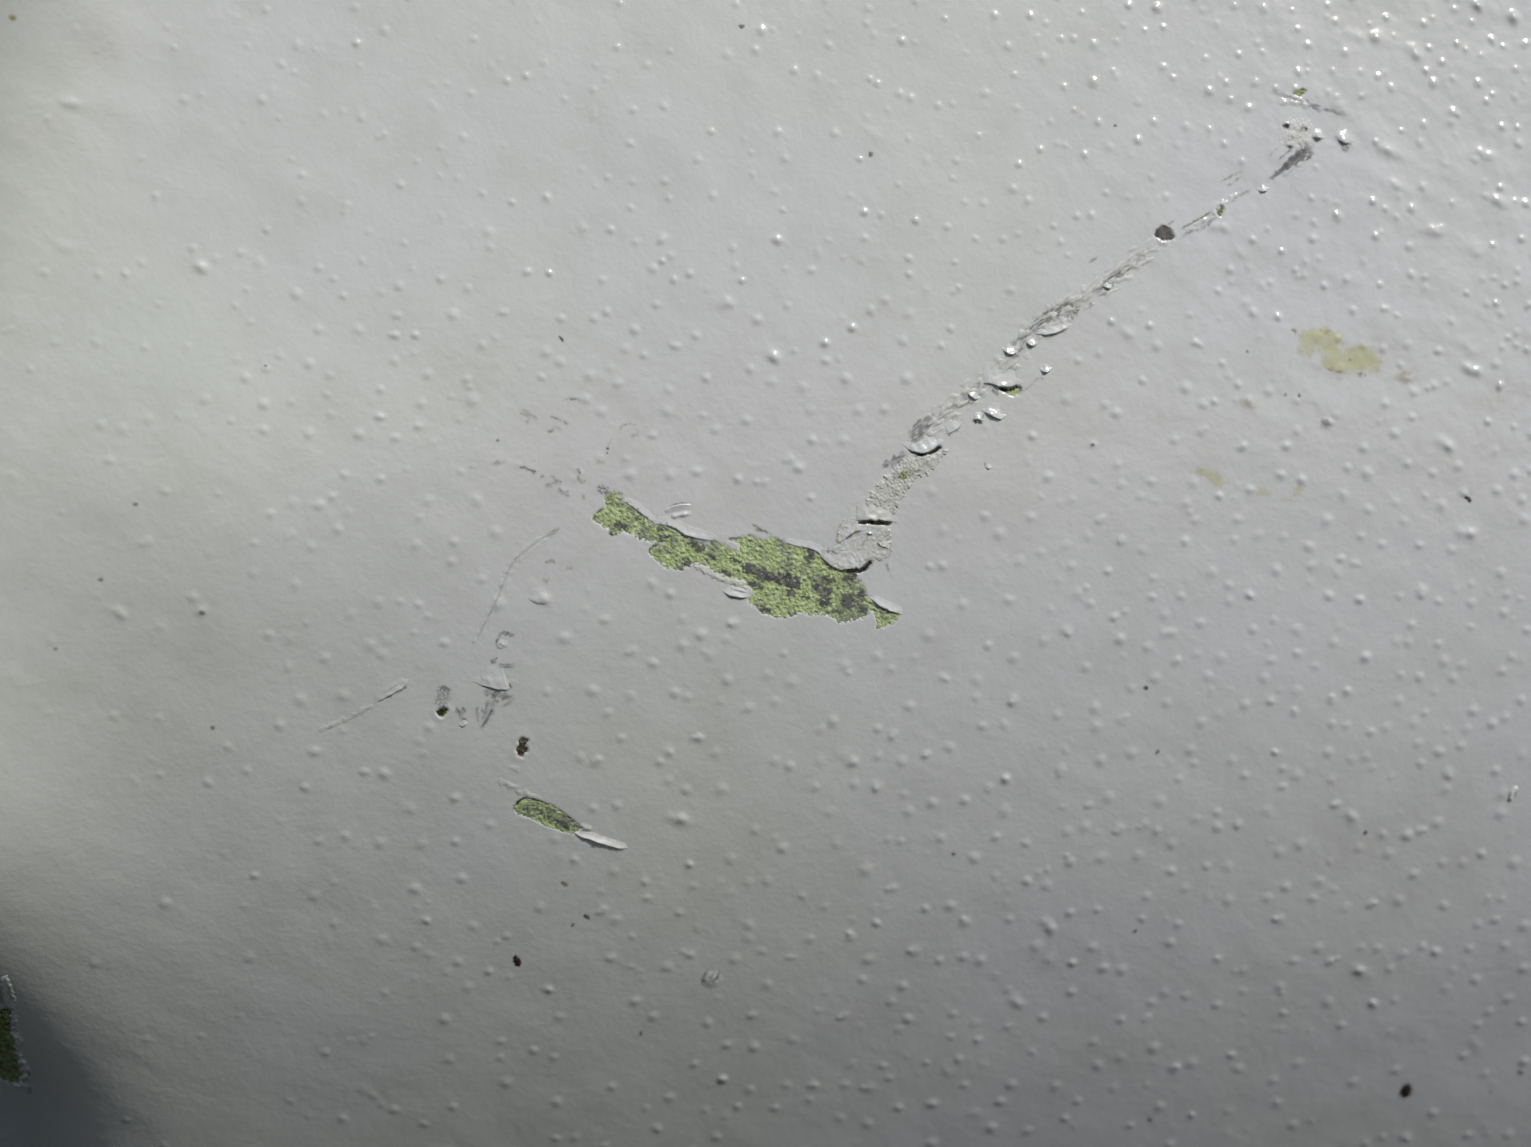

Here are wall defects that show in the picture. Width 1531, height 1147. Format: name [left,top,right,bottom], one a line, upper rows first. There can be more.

peeling [1154,225,1176,248]
peeling [967,392,1007,423]
peeling [592,487,903,629]
peeling [514,797,628,849]
peeling [0,975,35,1095]